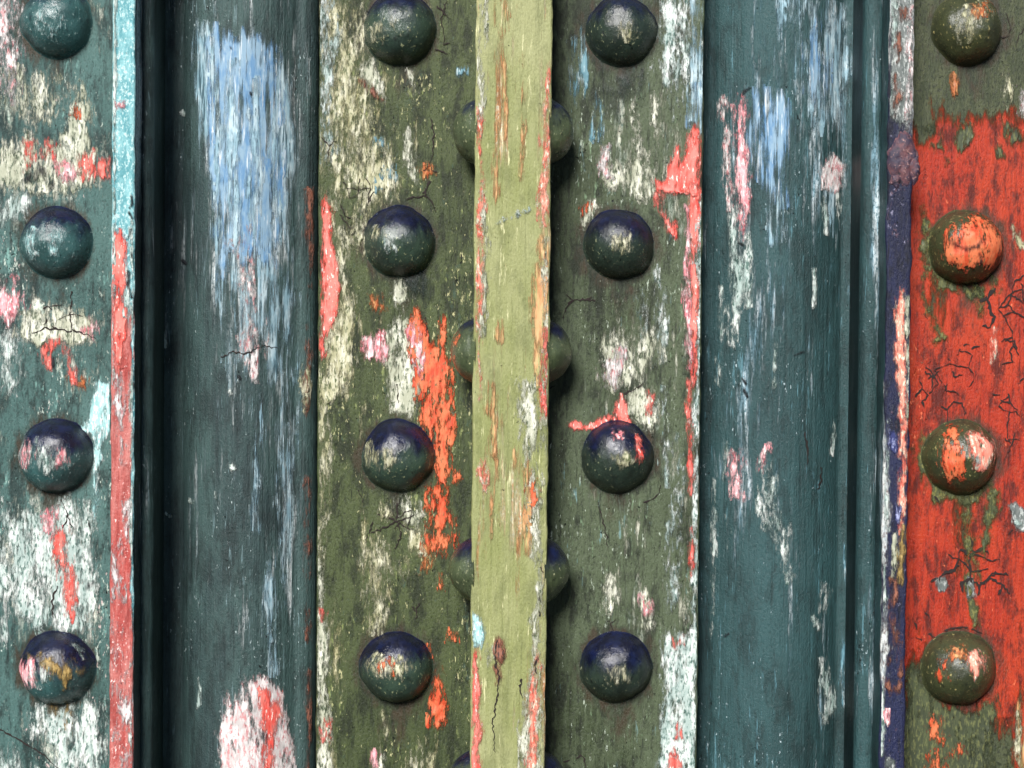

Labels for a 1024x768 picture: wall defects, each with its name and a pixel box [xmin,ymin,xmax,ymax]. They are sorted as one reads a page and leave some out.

crack [34,291,96,339]
peeling [0,0,133,469]
crack [220,345,277,357]
peeling [317,0,462,768]
peeling [568,0,703,768]
peeling [717,87,753,350]
crack [915,275,1024,453]
peeling [0,483,133,692]
crack [358,490,414,549]
crack [931,539,1010,595]
peeling [27,648,132,768]
peeling [218,675,297,768]